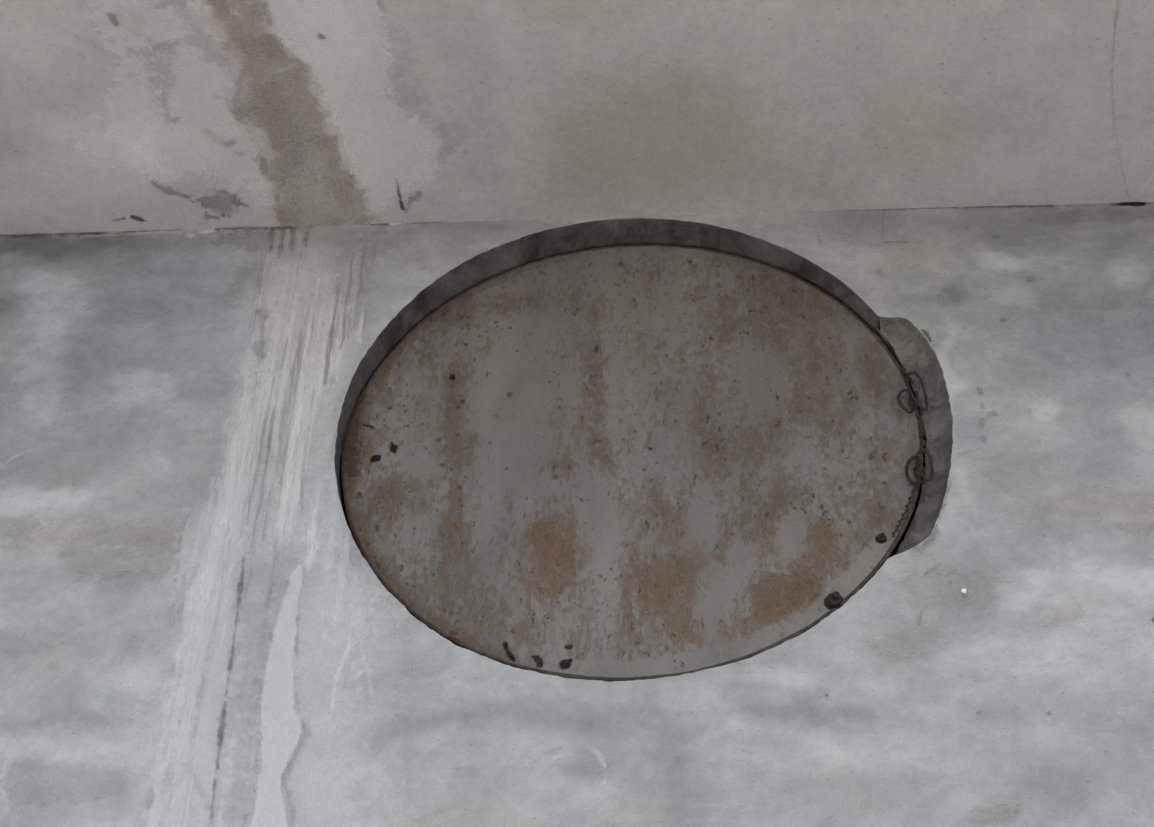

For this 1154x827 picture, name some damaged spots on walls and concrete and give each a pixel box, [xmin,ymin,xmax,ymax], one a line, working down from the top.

damp [251,565,302,827]